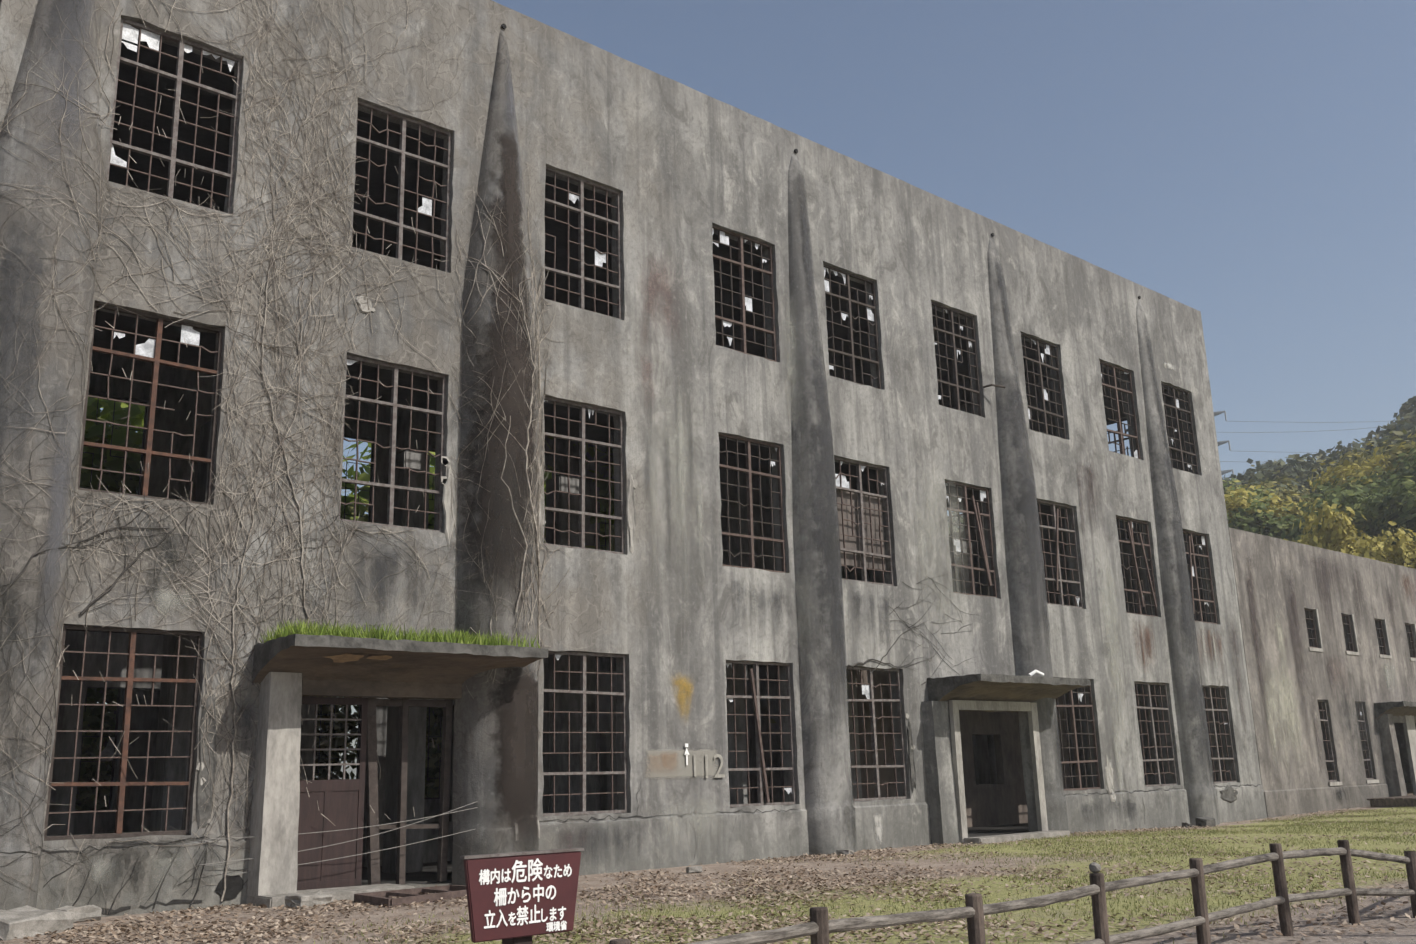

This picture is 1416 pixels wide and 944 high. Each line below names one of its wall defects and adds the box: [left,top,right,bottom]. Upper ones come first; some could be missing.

damp [463,75,535,570]
damp [802,195,817,317]
damp [800,348,873,682]